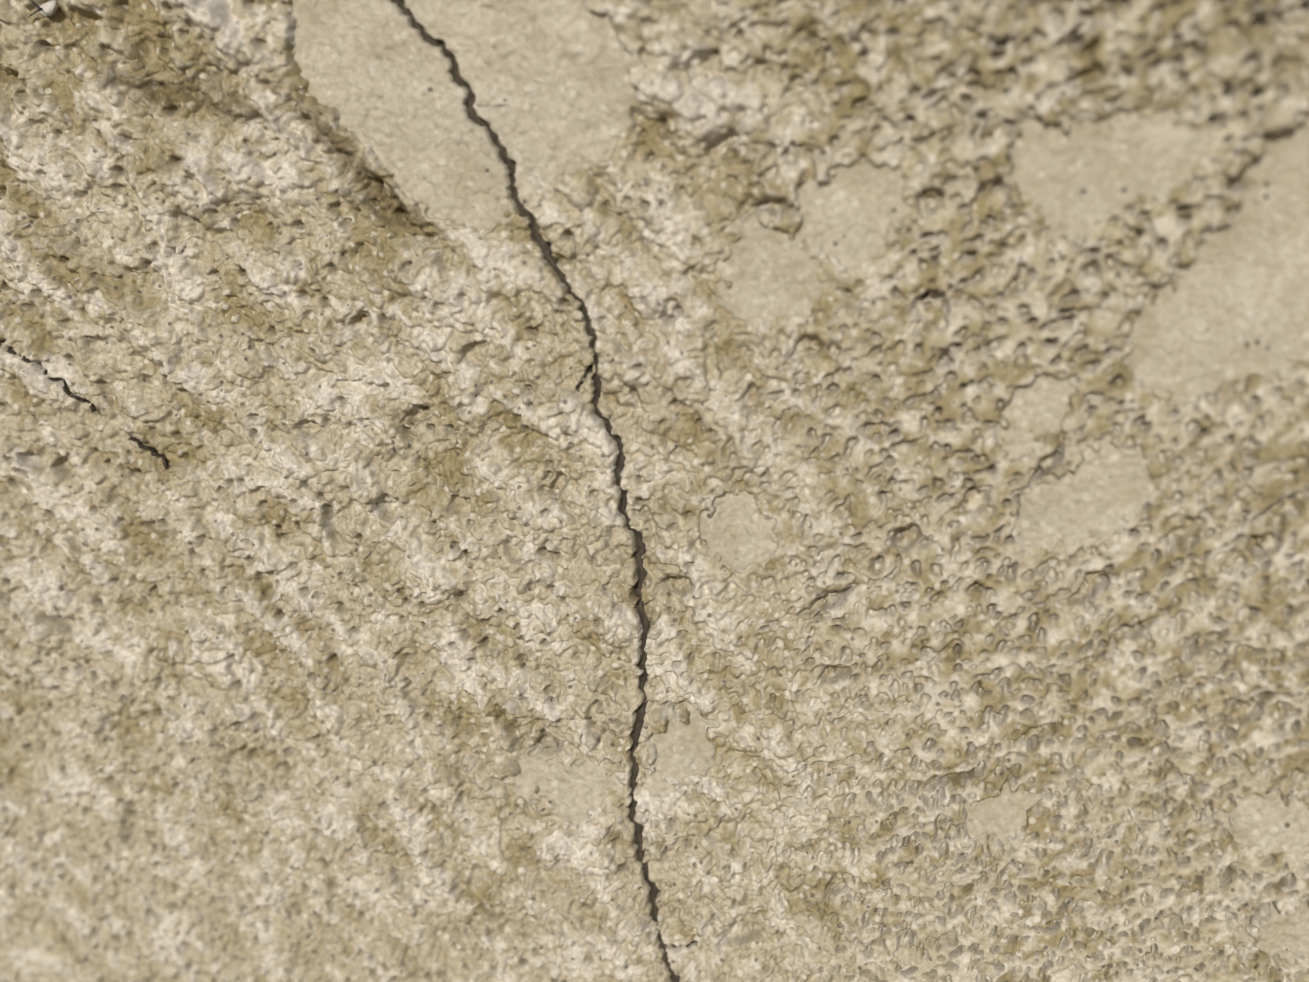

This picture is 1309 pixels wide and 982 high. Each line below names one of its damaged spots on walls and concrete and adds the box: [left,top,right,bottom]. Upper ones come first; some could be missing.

spalling [292,0,639,234]
spalling [716,161,912,329]
spalling [1006,109,1211,247]
spalling [1128,113,1309,402]
crack [0,341,97,413]
crack [128,437,168,470]
crack [390,0,697,982]